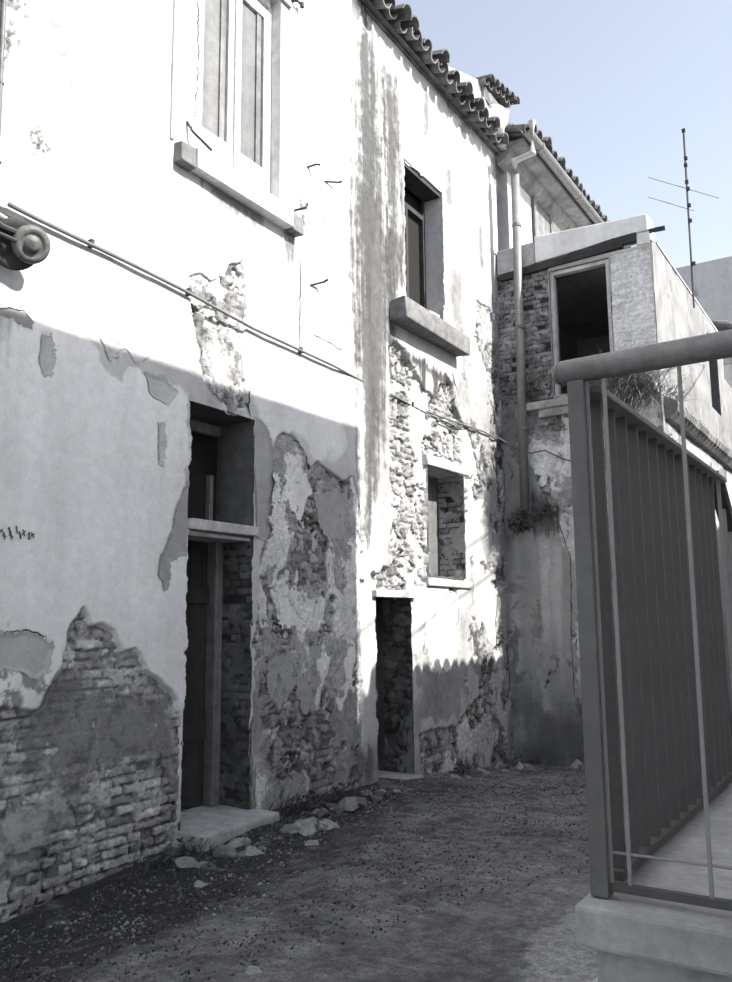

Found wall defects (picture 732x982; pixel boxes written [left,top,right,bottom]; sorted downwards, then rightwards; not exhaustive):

peeling [100,335,178,404]
flaking render [188,263,245,413]
water stain [349,1,455,544]
flaking render [451,269,573,516]
flaking render [610,247,657,351]
flaking render [630,397,663,429]
peeling [158,480,189,592]
flaking render [251,342,479,811]
flaking render [0,613,181,923]
flaking render [418,590,508,775]